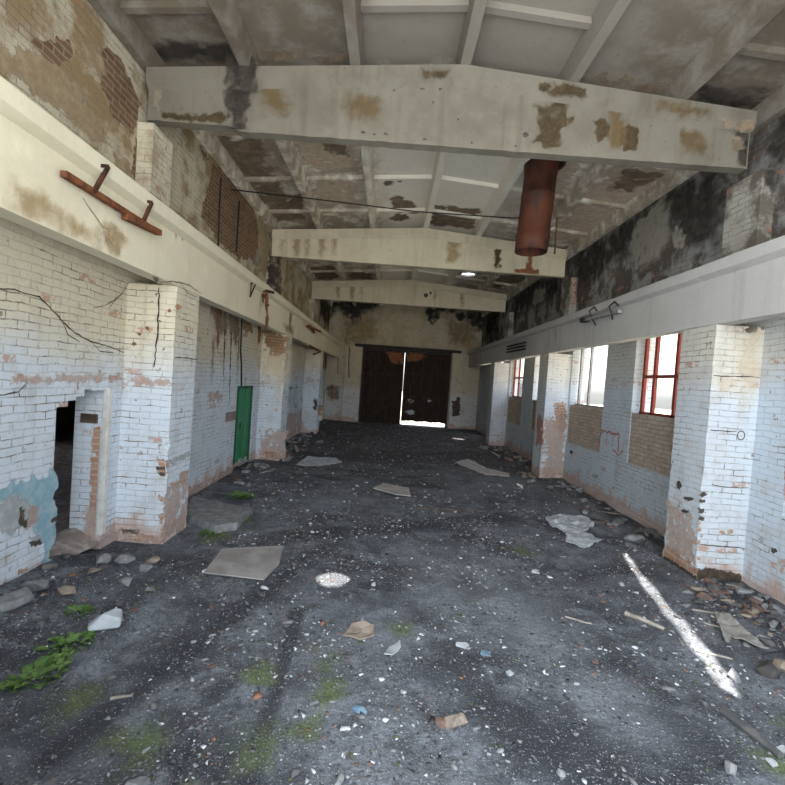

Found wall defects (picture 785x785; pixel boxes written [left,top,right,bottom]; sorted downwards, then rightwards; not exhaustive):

peeling [0,36,140,179]
water stain [533,83,586,148]
water stain [595,111,639,151]
water stain [680,131,706,153]
flaking render [199,145,272,278]
crack [0,288,124,353]
crack [153,281,201,367]
rust [258,293,289,358]
water stain [320,300,330,325]
peeling [0,468,59,564]
peeling [115,452,232,544]
flaking render [662,481,785,630]